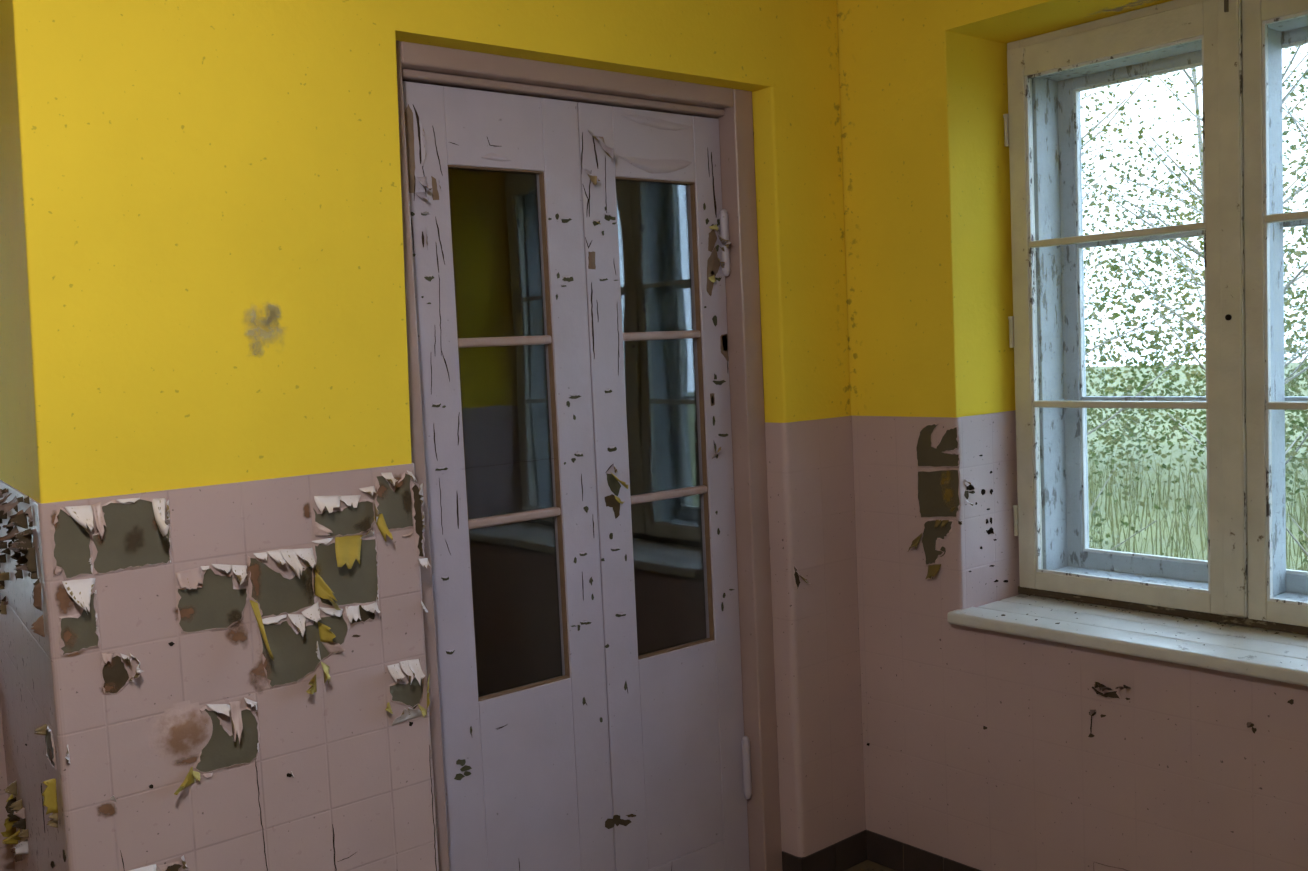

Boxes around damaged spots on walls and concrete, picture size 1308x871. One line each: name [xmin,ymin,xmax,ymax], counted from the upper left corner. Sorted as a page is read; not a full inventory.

peeling [907,423,997,579]
peeling [0,470,431,795]
peeling [1088,682,1131,737]
peeling [0,780,29,862]
peeling [25,724,70,828]
peeling [120,850,189,871]
crack [255,761,268,871]
crack [332,824,358,871]
crack [429,745,437,871]